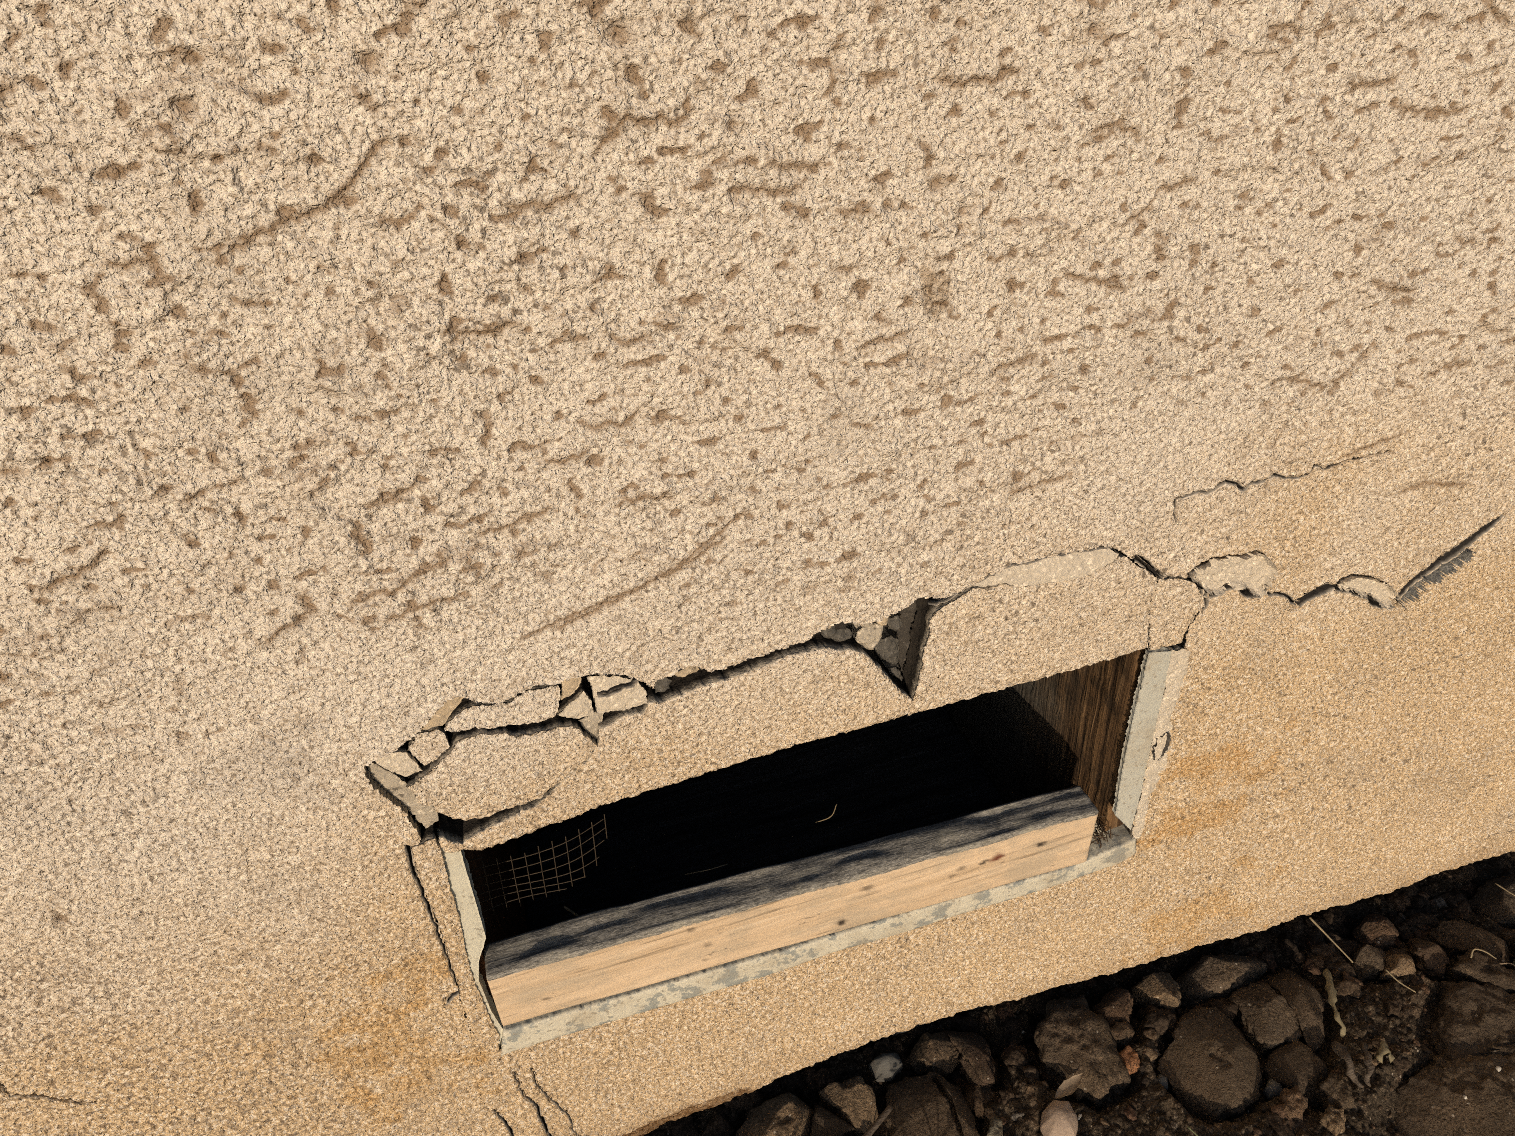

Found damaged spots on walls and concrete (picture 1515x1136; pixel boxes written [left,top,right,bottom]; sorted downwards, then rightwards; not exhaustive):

crack [926,514,1504,611]
crack [676,622,849,673]
spalling [821,600,917,681]
spalling [367,666,699,828]
crack [404,845,459,1007]
crack [492,1067,581,1136]